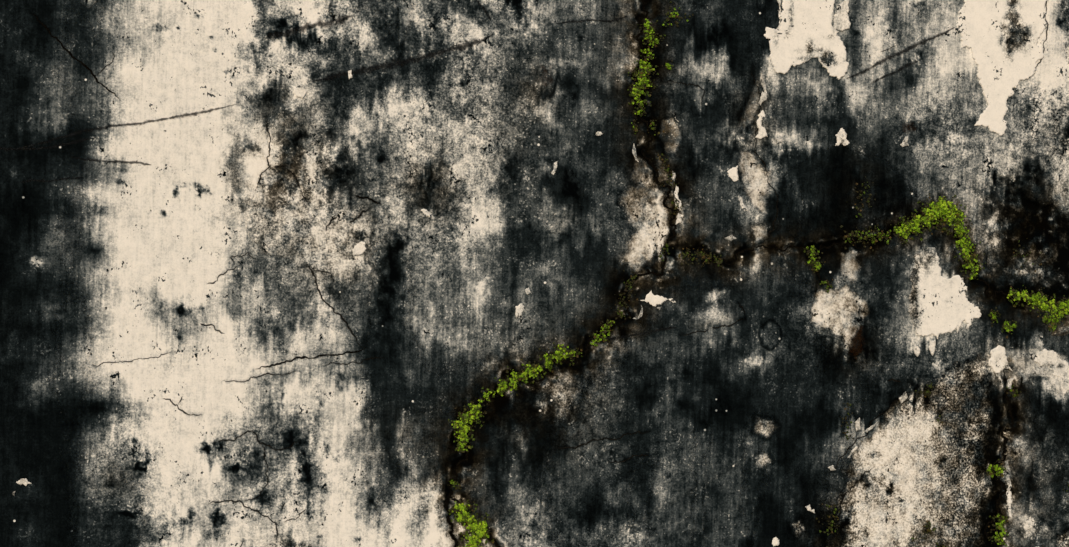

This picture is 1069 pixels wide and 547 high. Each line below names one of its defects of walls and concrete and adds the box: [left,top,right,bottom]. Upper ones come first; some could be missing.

peeling [738,0,851,143]
peeling [956,0,1048,136]
crack [1033,1,1049,76]
flaking render [727,149,772,242]
water stain [0,0,151,547]
crack [94,352,170,367]
crack [163,397,202,416]
crack [209,430,305,539]
crack [223,262,383,382]
crack [444,0,1041,547]
peeling [908,247,981,357]
flaking render [828,345,1069,547]